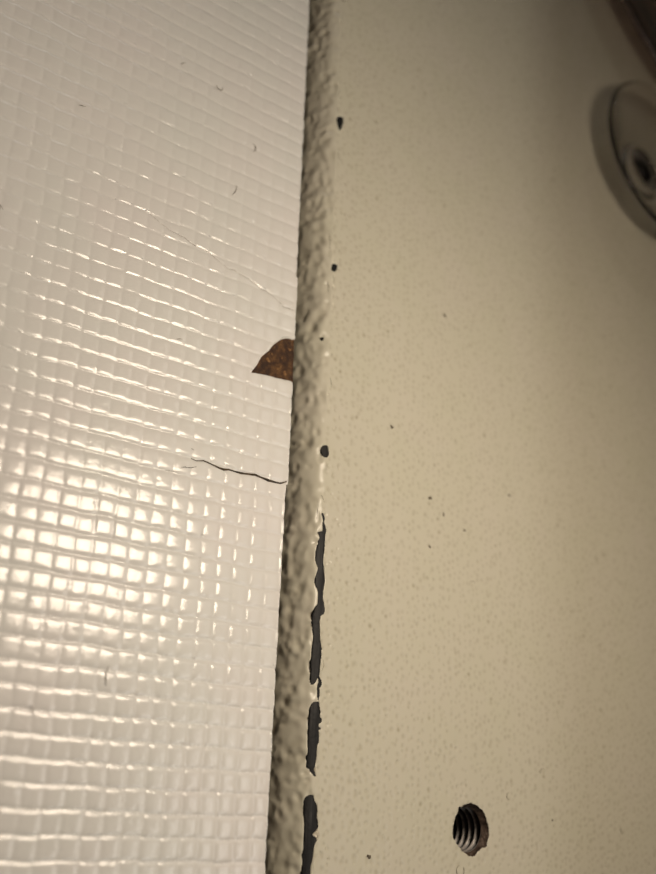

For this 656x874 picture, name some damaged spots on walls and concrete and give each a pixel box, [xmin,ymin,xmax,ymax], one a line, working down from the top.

rust [252,338,294,382]
crack [167,448,287,484]
peeling [306,513,326,776]
peeling [301,795,320,874]